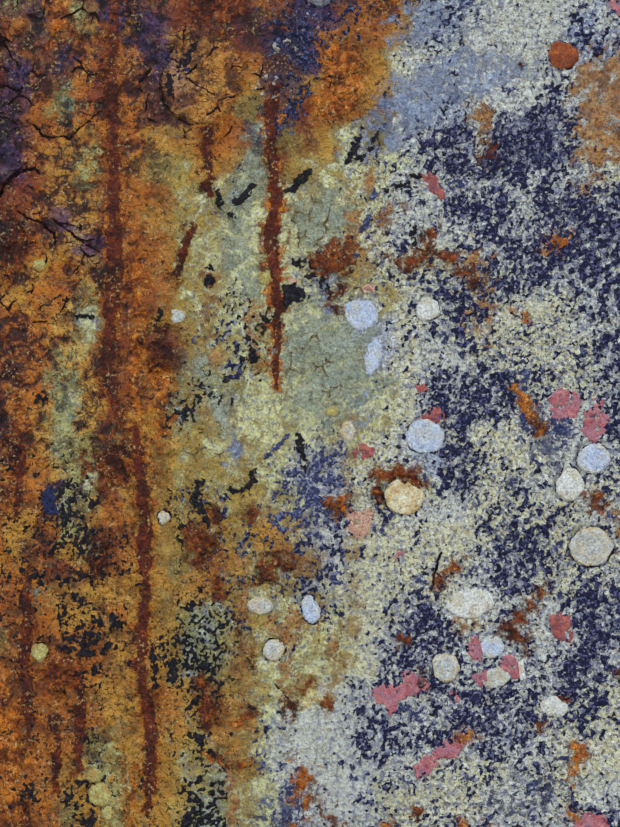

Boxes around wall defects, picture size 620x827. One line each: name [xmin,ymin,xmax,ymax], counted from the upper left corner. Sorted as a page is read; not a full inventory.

crack [12,0,100,24]
crack [0,34,101,140]
corrosion [563,41,620,205]
crack [0,167,40,197]
crack [1,210,103,272]
crack [0,274,68,323]
corrosion [0,0,431,827]
corrosion [452,617,481,640]